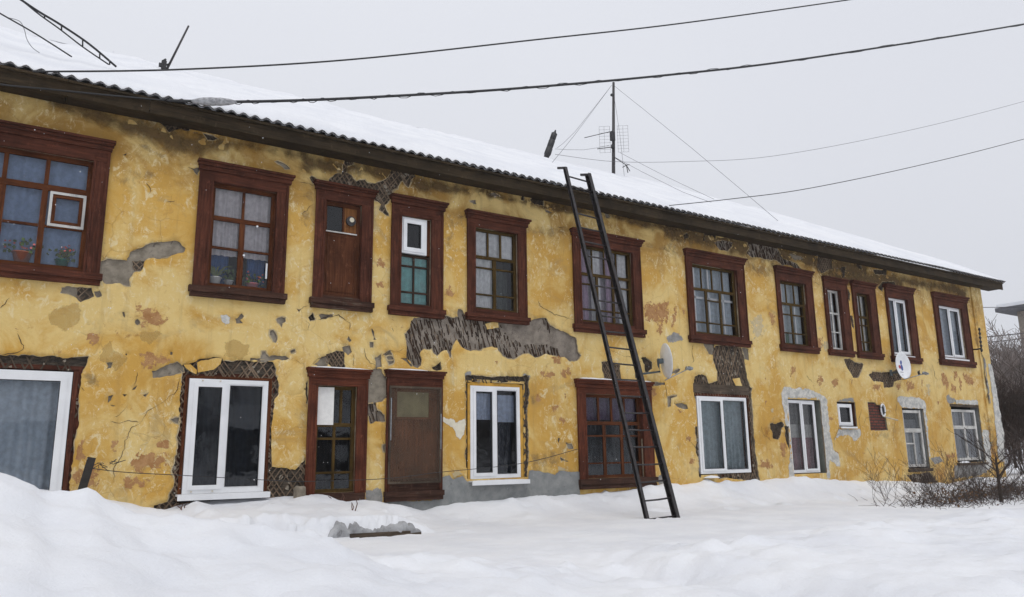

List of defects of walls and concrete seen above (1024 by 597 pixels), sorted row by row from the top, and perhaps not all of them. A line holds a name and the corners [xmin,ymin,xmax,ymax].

flaking render [309,161,414,216]
flaking render [60,241,185,302]
crack [112,382,179,479]
flaking render [123,316,305,510]
flaking render [314,336,351,367]
flaking render [368,309,582,477]
flaking render [641,312,790,480]
flaking render [844,358,974,431]